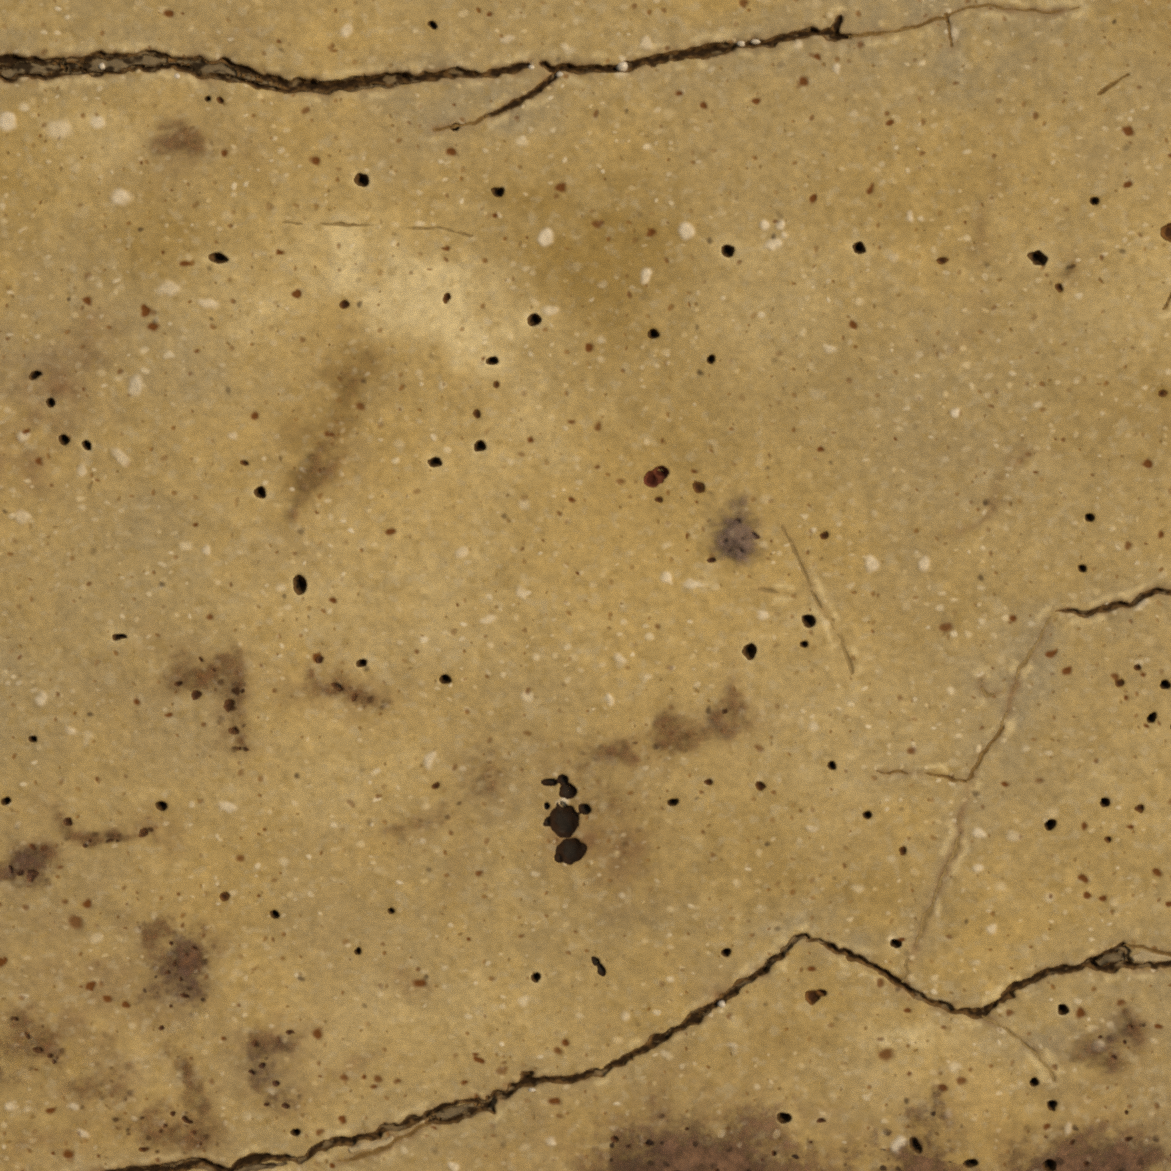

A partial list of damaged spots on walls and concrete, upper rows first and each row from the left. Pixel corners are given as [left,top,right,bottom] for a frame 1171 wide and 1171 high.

crack [0,3,1079,131]
crack [877,588,1171,783]
crack [108,815,1171,1171]
leakage [609,1108,811,1171]
leakage [880,1139,958,1171]
leakage [1012,1123,1171,1171]